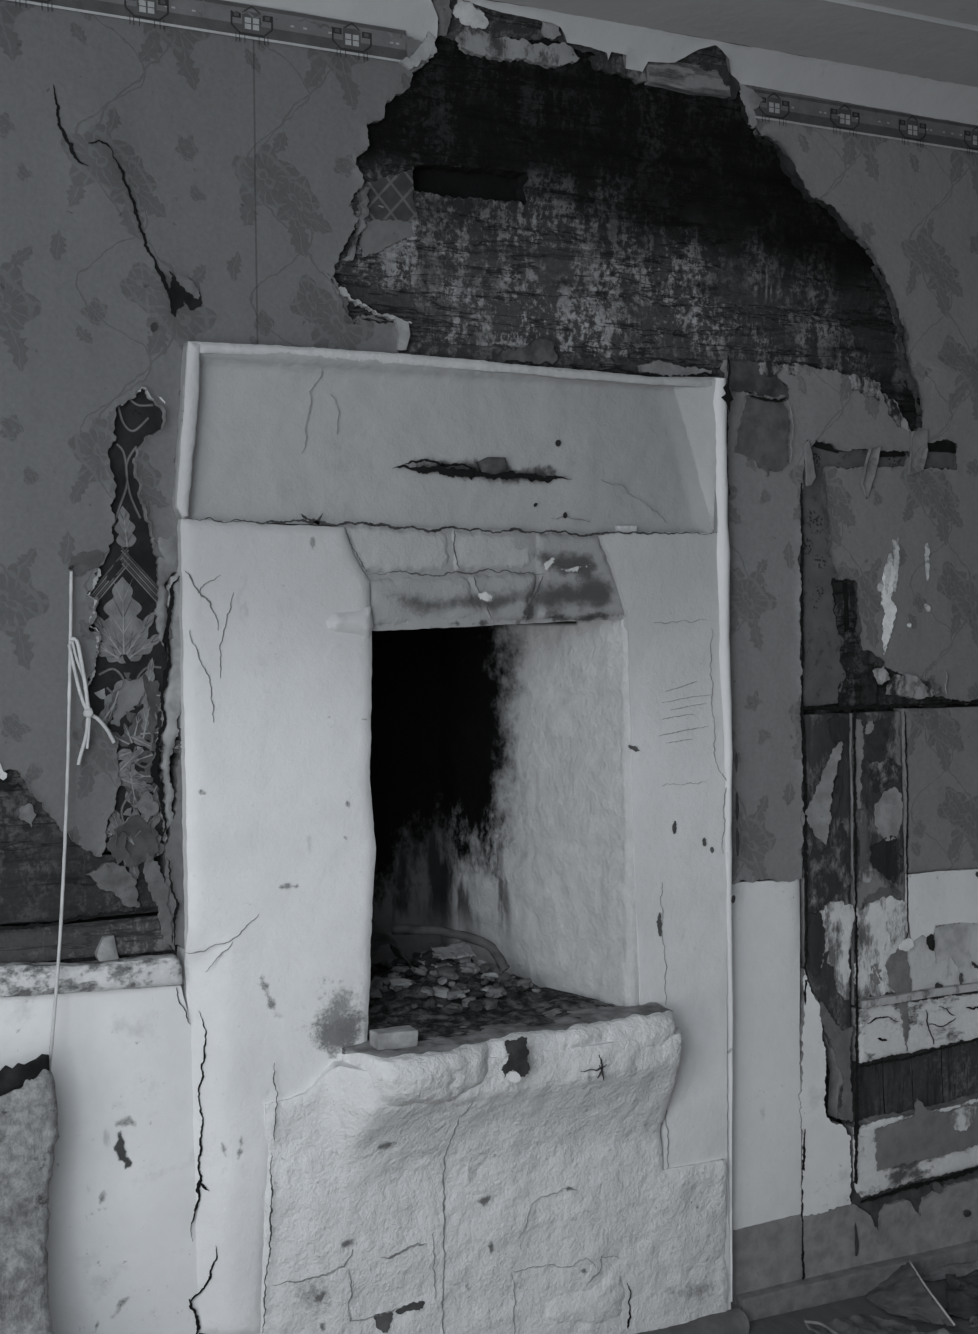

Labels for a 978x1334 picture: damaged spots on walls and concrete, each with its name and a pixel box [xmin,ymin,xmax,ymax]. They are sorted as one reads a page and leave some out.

crack [53,85,176,317]
spalling [327,0,923,476]
peeling [68,550,104,577]
spalling [143,523,185,950]
crack [150,571,259,972]
crack [188,459,717,617]
crack [176,987,218,1334]
spalling [502,1036,530,1083]